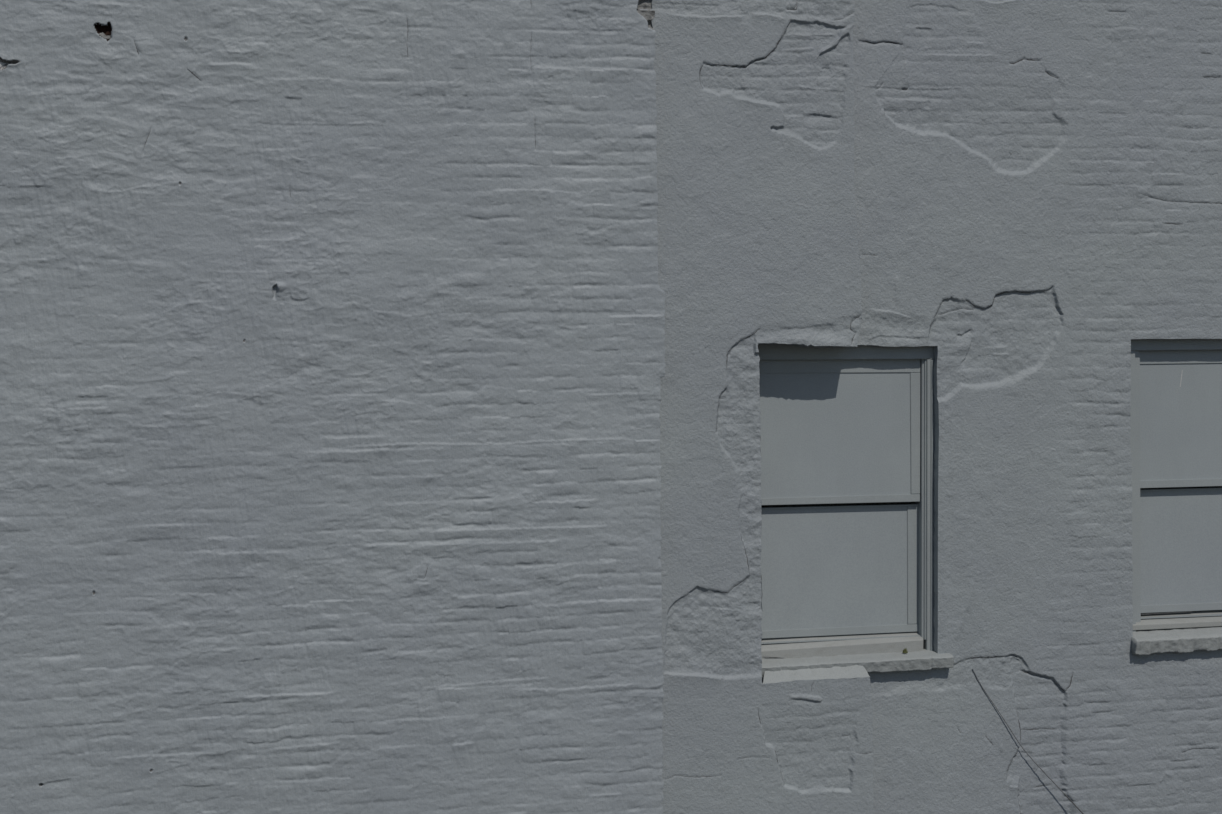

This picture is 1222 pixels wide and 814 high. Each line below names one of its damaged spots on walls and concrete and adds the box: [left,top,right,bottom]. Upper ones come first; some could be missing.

flaking render [637,0,855,151]
flaking render [873,3,1069,176]
flaking render [662,285,1065,680]
crack [958,655,1073,691]
crack [958,709,1055,814]